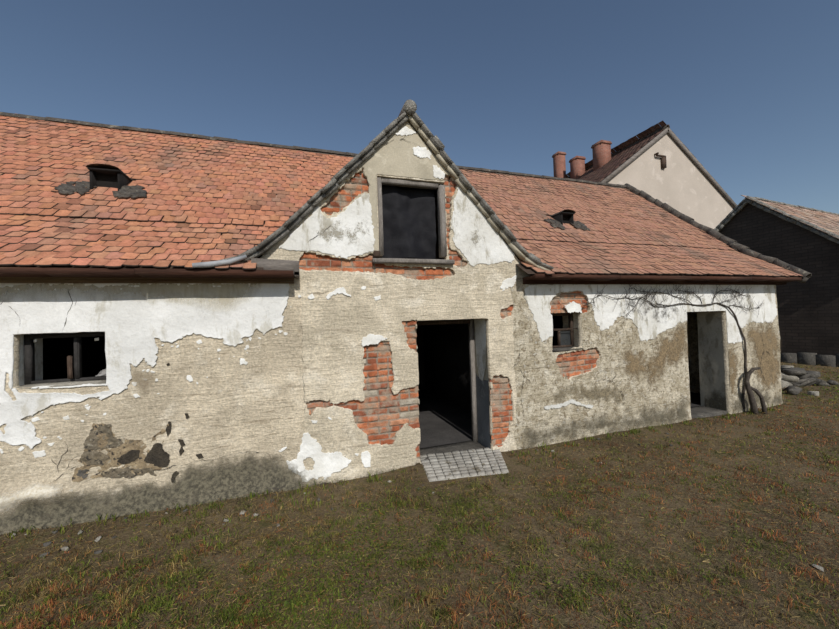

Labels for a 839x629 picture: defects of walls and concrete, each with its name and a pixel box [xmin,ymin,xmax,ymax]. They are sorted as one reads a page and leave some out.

peeling [395,126,416,136]
peeling [0,146,467,516]